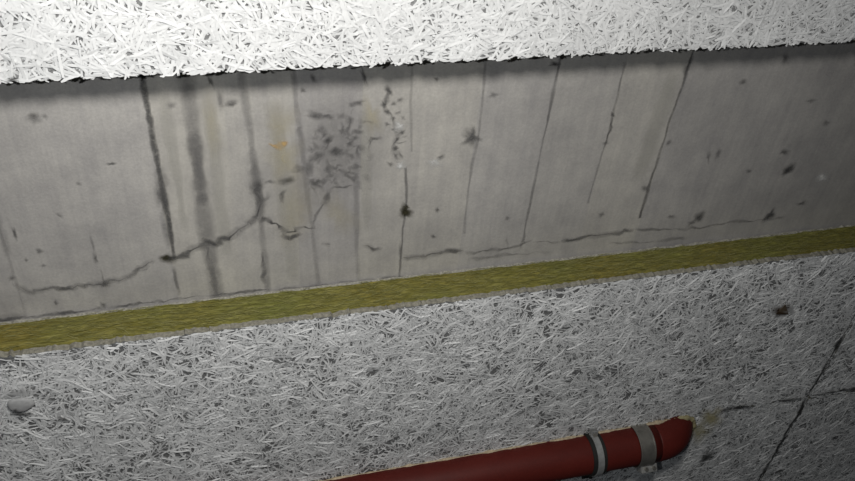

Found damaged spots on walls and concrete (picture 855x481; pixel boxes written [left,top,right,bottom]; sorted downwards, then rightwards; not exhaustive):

leakage [142,76,174,251]
crack [173,234,234,259]